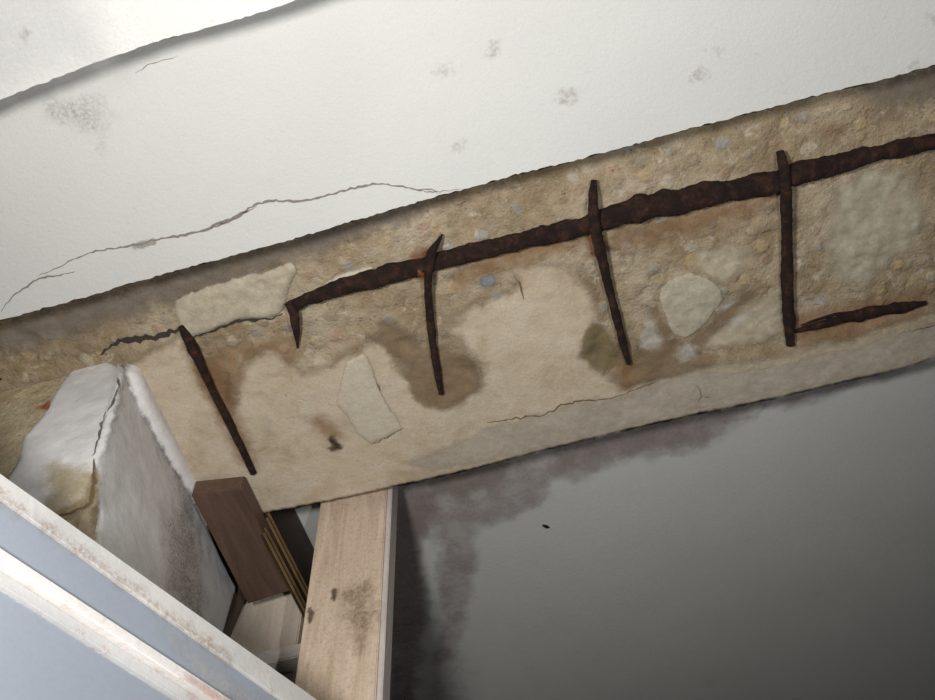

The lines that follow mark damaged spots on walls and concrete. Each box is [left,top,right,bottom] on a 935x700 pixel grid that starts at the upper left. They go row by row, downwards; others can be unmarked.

crack [1,182,459,312]
spalling [0,65,935,443]
water stain [380,324,478,406]
water stain [584,291,755,387]
corrosion [799,299,920,335]
water stain [616,408,746,449]
spalling [63,472,99,541]
water stain [392,465,515,700]